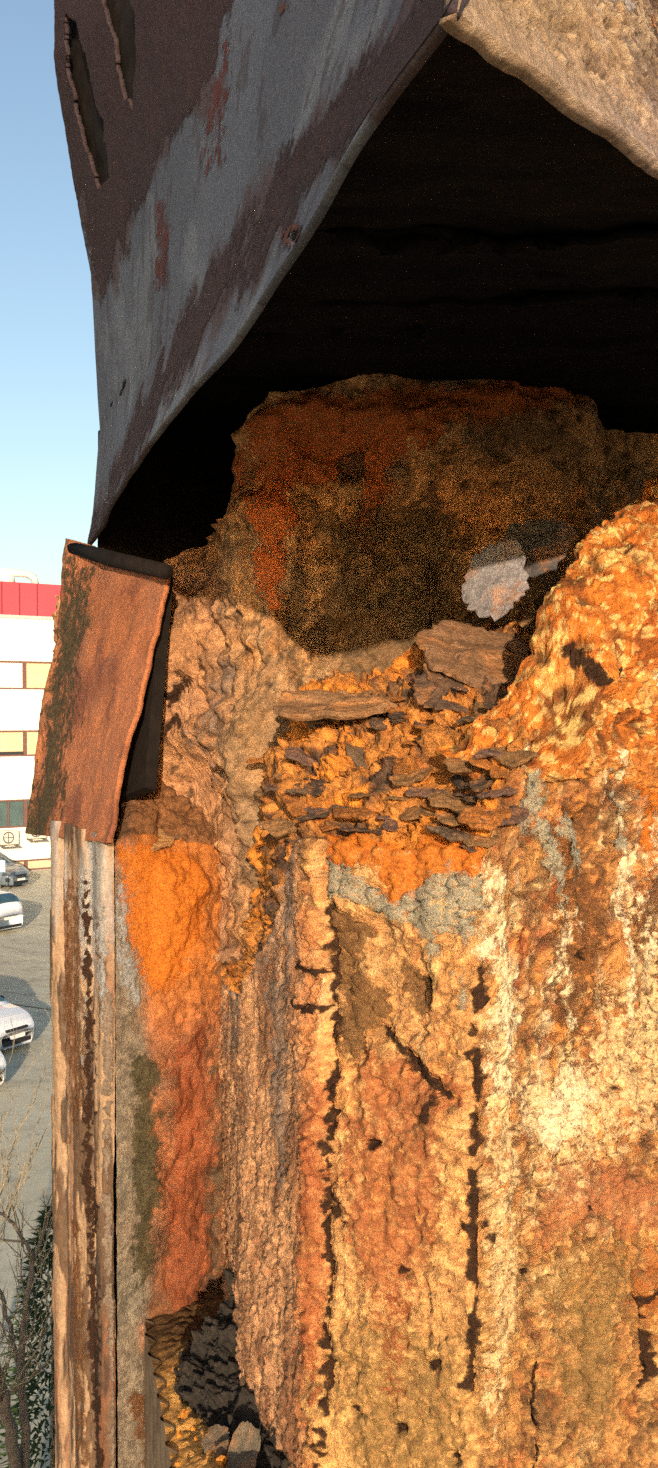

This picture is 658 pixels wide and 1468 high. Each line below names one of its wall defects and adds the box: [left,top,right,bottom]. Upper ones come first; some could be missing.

corrosion [625,0,658,43]
water stain [77,832,111,1064]
corrosion [115,828,211,1004]
water stain [326,749,658,1440]